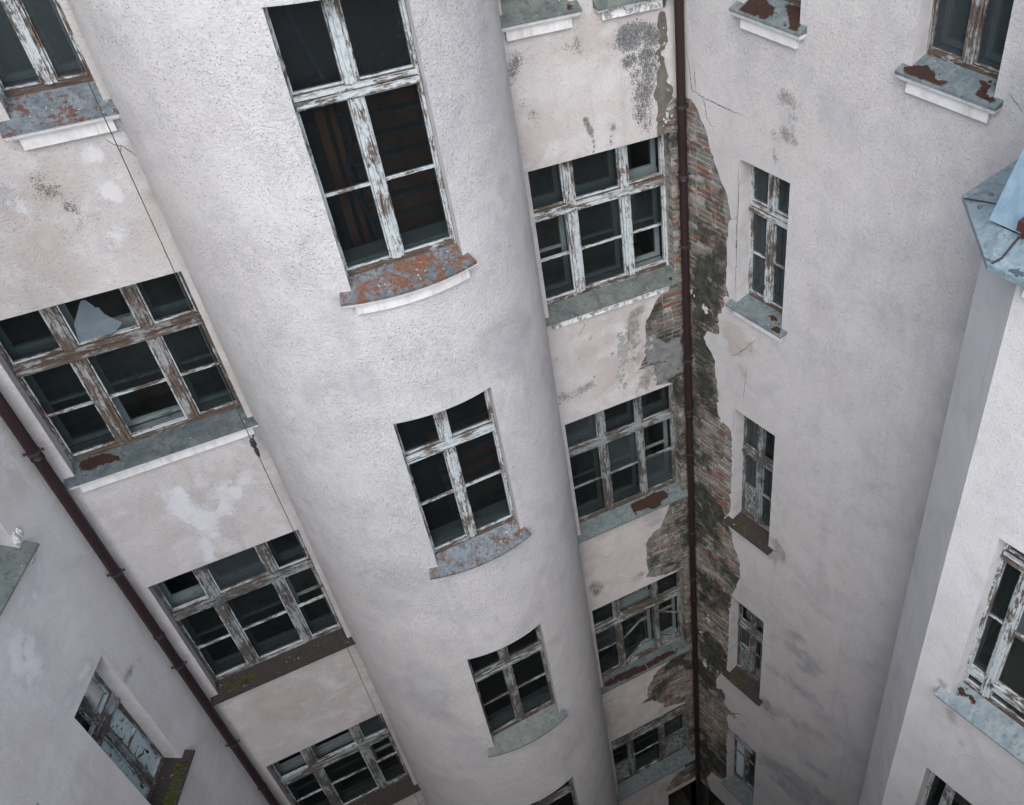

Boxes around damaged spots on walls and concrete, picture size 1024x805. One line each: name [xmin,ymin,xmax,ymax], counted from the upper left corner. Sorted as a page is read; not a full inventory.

corrosion [739,0,801,31]
damp [603,16,666,138]
crack [687,55,743,126]
corrosion [903,65,947,87]
corrosion [975,80,996,103]
spalling [606,0,740,791]
corrosion [79,453,121,476]
corrosion [631,490,671,515]